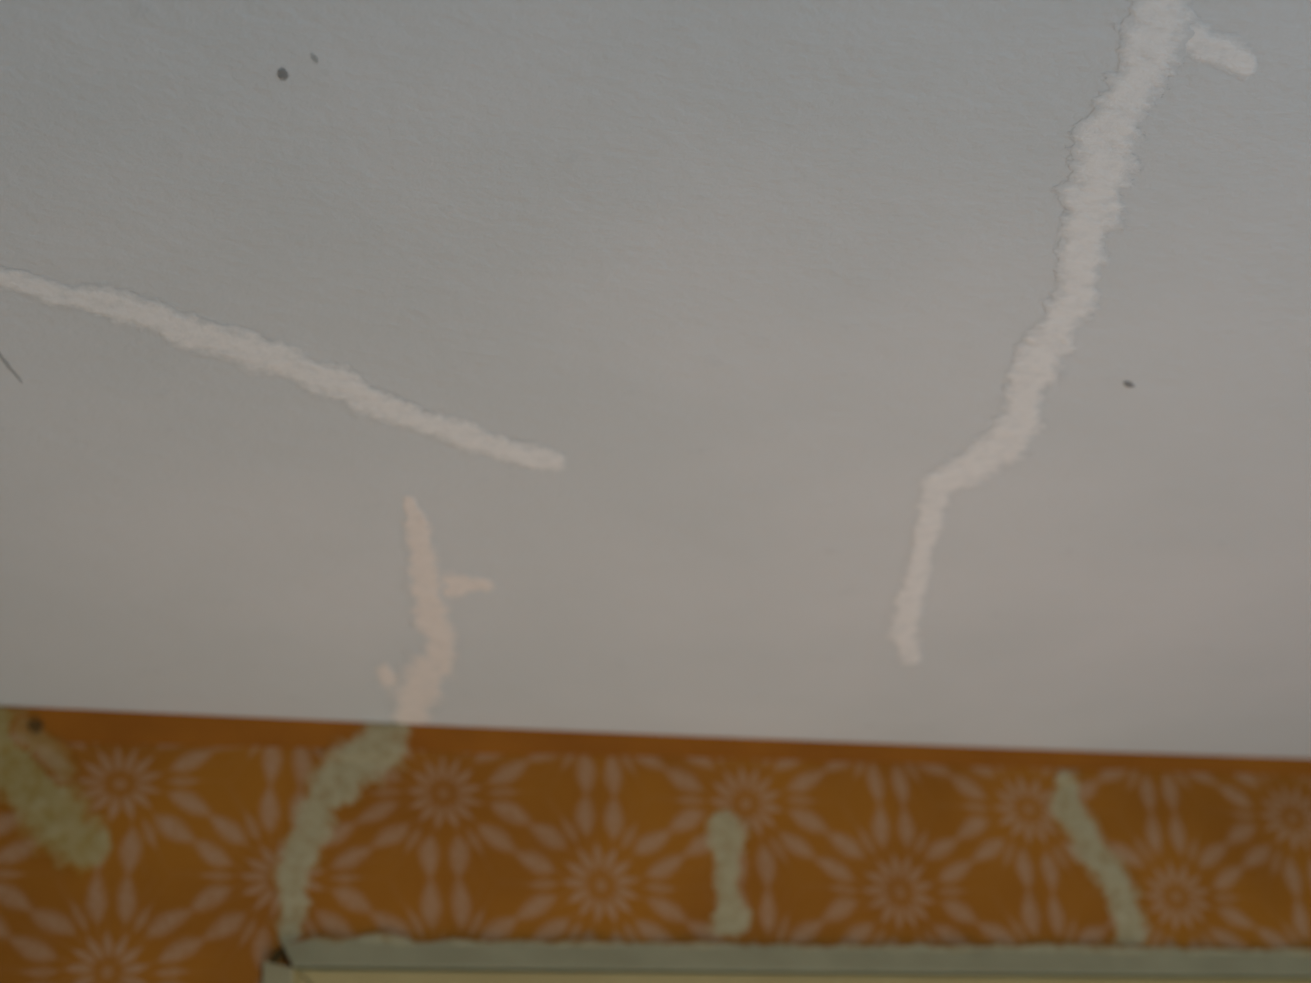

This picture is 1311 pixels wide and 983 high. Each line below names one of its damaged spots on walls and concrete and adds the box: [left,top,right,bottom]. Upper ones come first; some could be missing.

crack [0,266,569,474]
crack [882,0,1259,665]
crack [0,706,114,879]
crack [265,495,497,945]
crack [698,807,756,941]
crack [1045,770,1155,947]